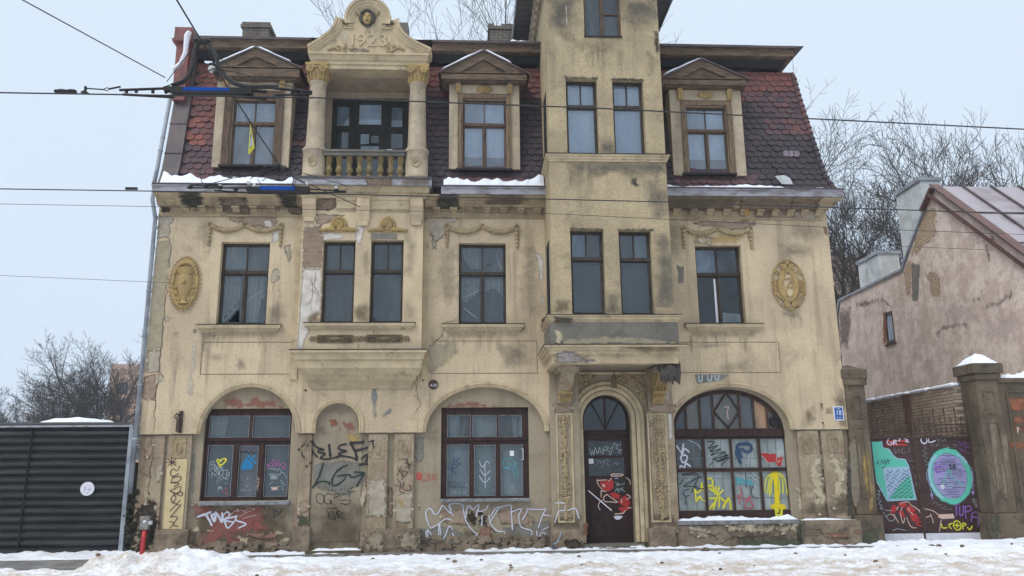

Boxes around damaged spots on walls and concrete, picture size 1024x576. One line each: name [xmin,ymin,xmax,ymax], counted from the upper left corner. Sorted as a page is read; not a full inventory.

water stain [578,145,663,186]
flaking render [218,197,250,215]
peeling [264,198,365,349]
water stain [626,228,673,307]
flaking render [903,208,937,296]
flaking render [925,272,941,297]
flaking render [554,317,596,363]
flaking render [142,348,164,401]
peeling [359,477,414,524]